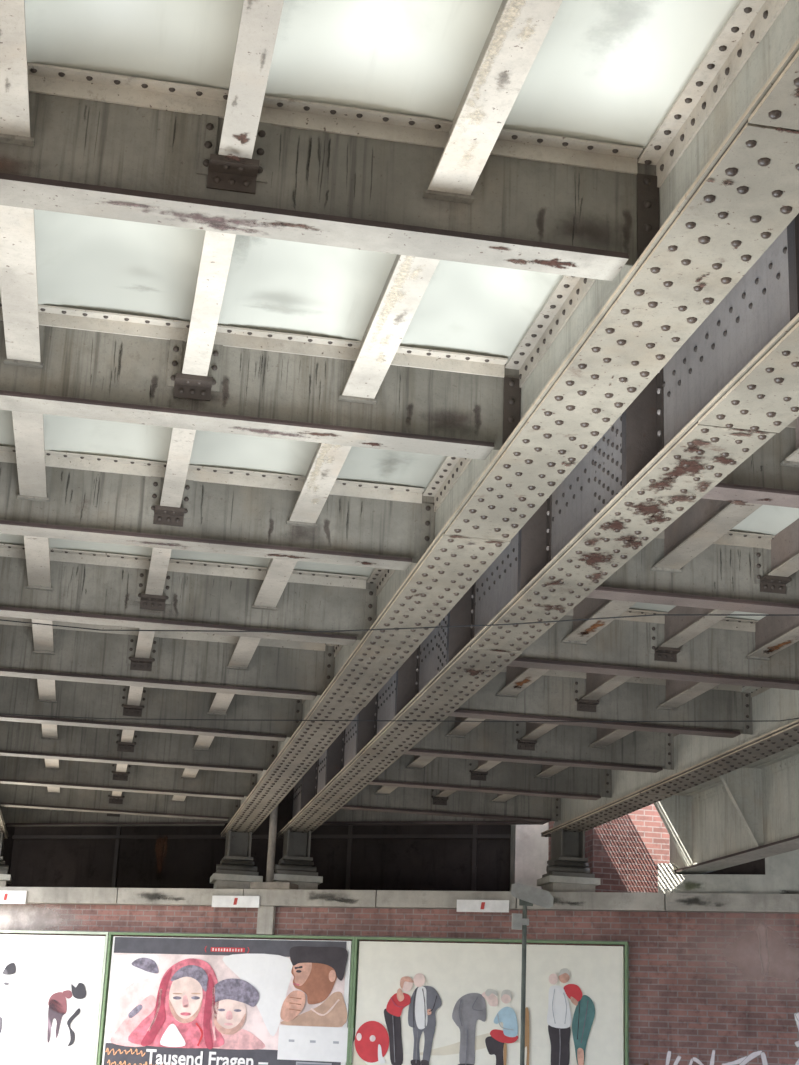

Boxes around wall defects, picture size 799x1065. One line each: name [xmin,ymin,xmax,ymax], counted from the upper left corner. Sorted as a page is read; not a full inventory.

corrosion [161,212,319,233]
corrosion [579,439,734,581]